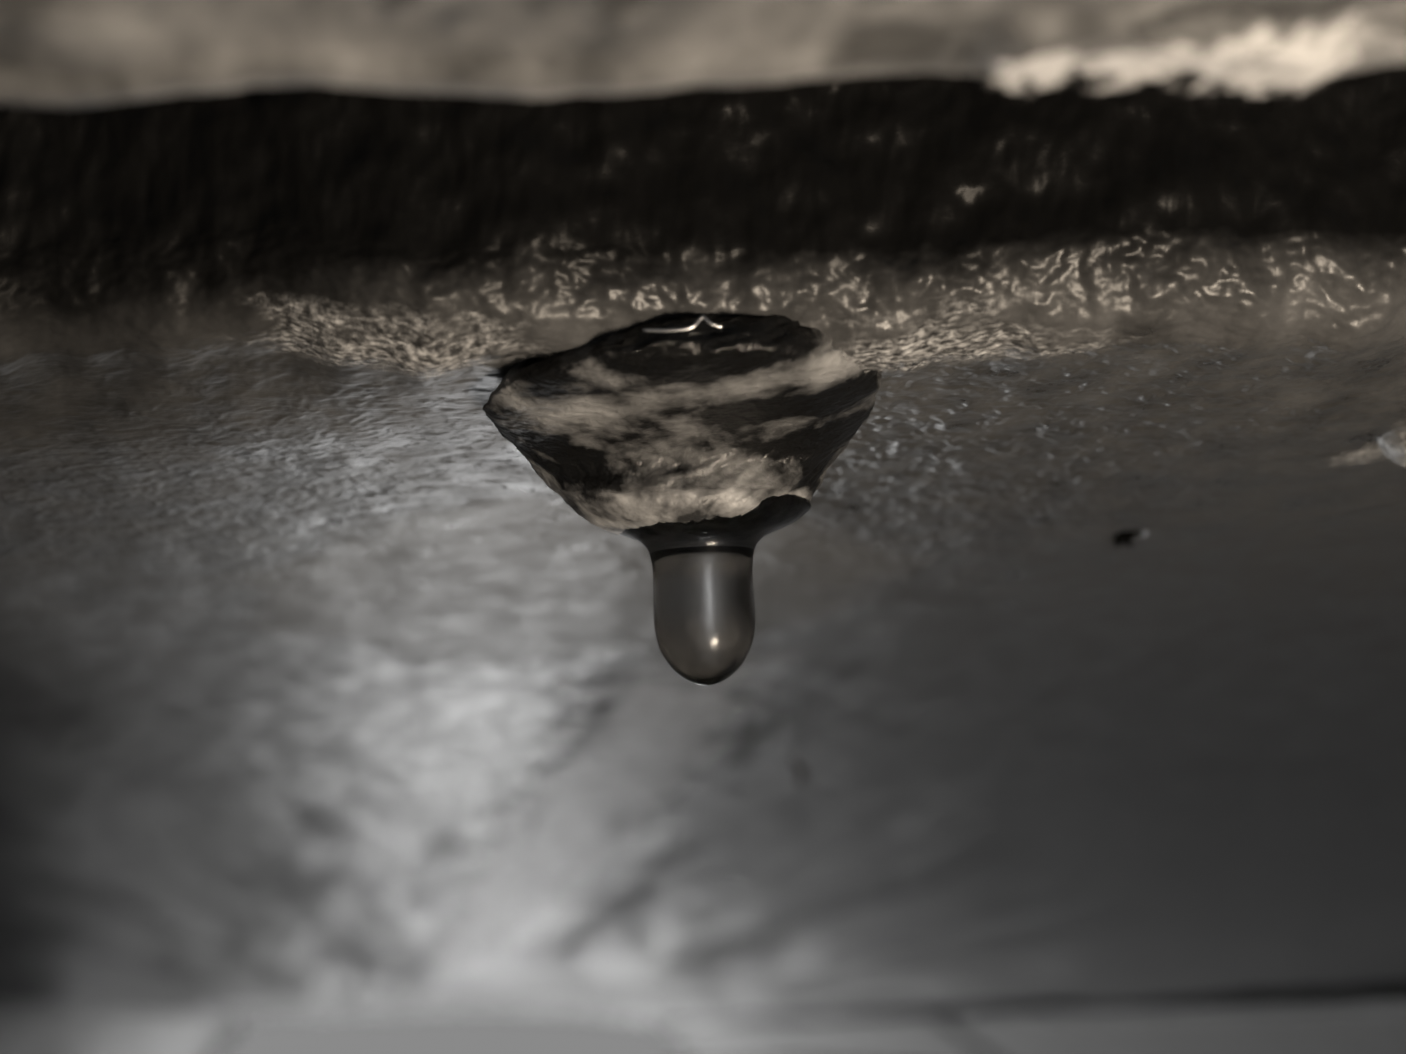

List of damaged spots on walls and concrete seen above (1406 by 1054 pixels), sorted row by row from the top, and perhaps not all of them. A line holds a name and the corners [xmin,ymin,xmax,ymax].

spalling [1331,433,1406,467]